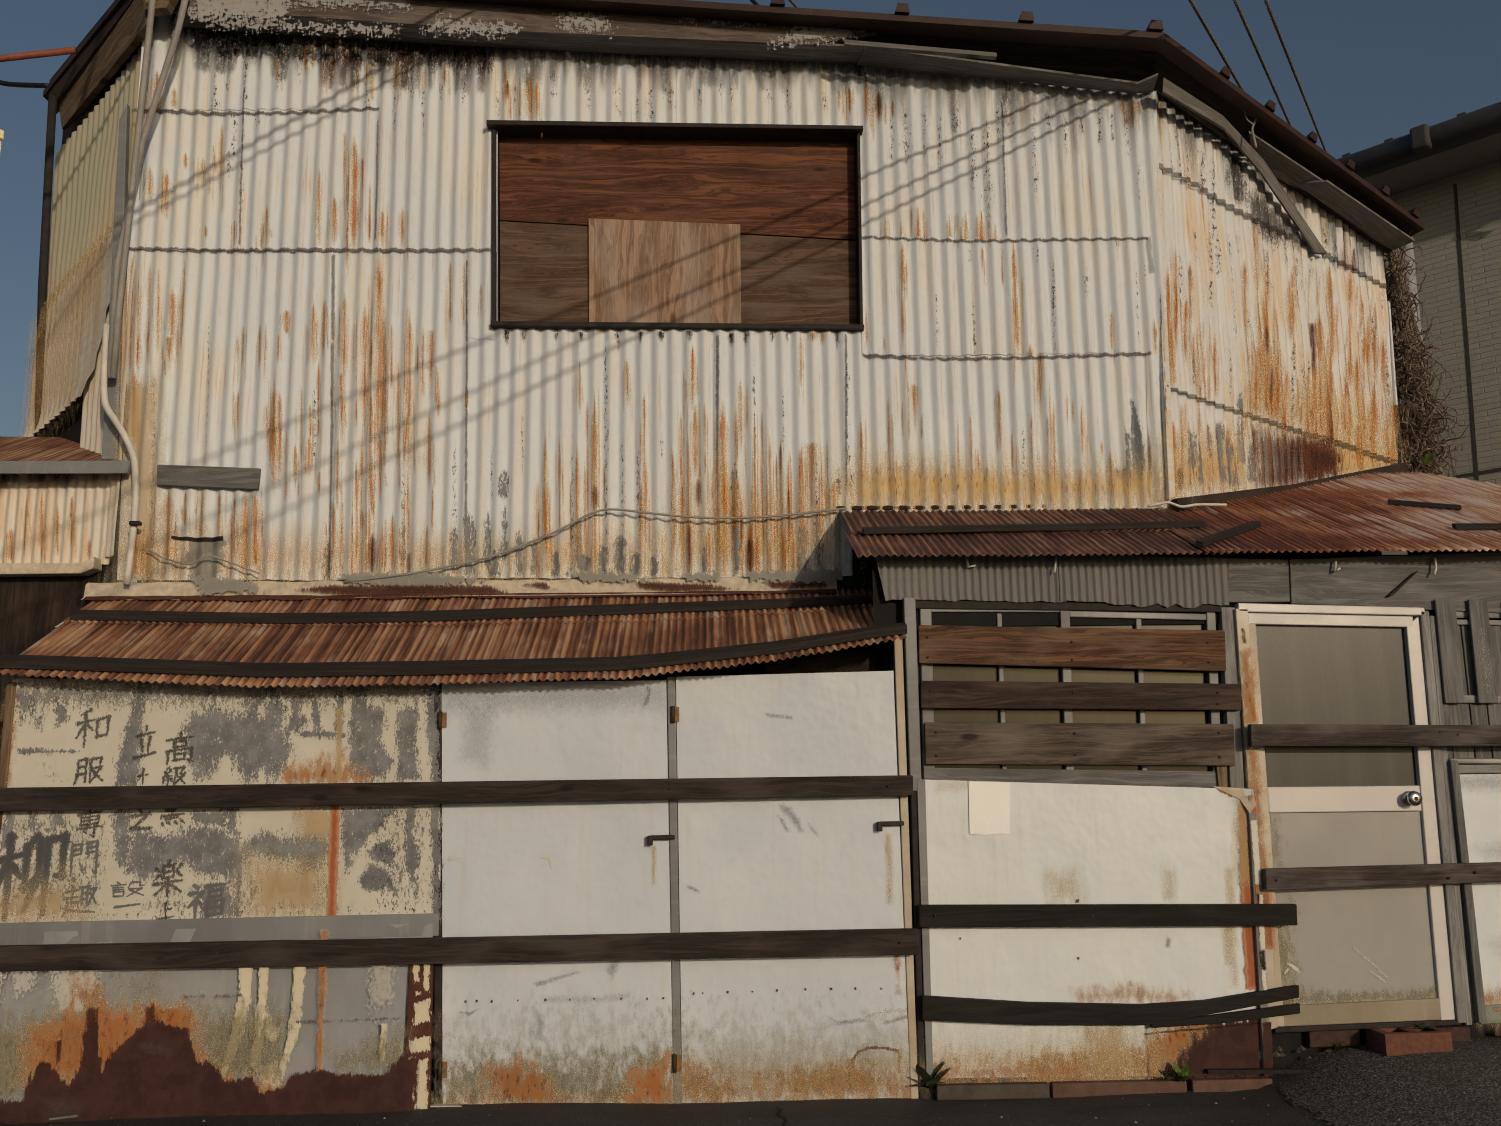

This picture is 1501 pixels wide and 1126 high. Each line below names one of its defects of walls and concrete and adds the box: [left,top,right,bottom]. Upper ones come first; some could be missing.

peeling [186,0,526,41]
water stain [169,11,864,195]
water stain [891,103,1014,214]
water stain [1032,108,1140,192]
rust [266,269,440,573]
rust [671,210,1397,573]
peeling [3,676,442,786]
peeling [109,804,445,921]
rust [1243,926,1276,990]
peeling [234,966,306,1094]
peeling [408,964,462,1109]
rust [448,1051,911,1105]